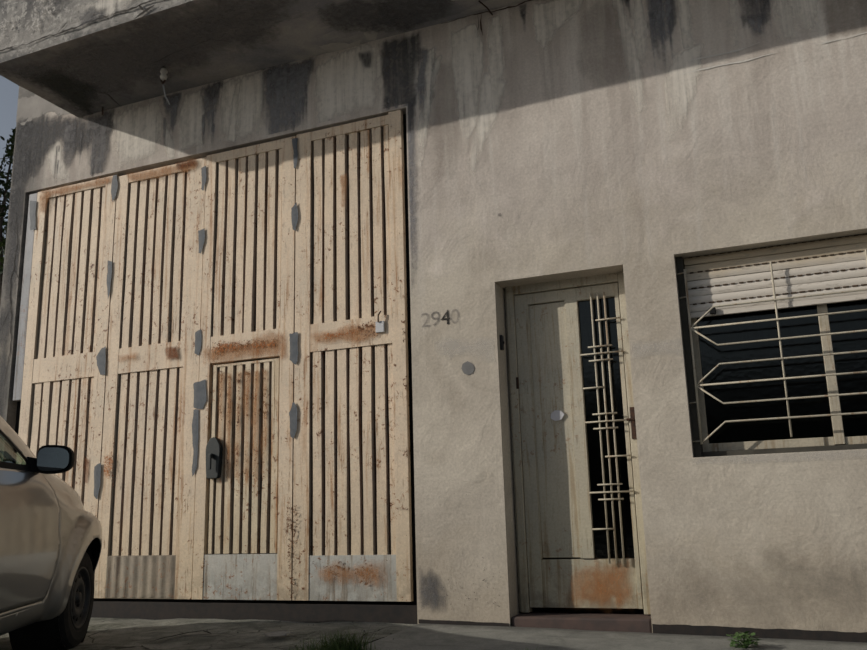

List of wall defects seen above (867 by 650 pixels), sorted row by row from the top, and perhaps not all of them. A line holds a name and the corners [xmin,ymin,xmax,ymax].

crack [0,0,156,51]
damp [452,16,504,167]
damp [613,0,701,131]
rust [128,160,195,180]
damp [0,0,456,416]
rust [211,338,284,360]
rust [219,369,267,476]
rust [312,561,378,585]